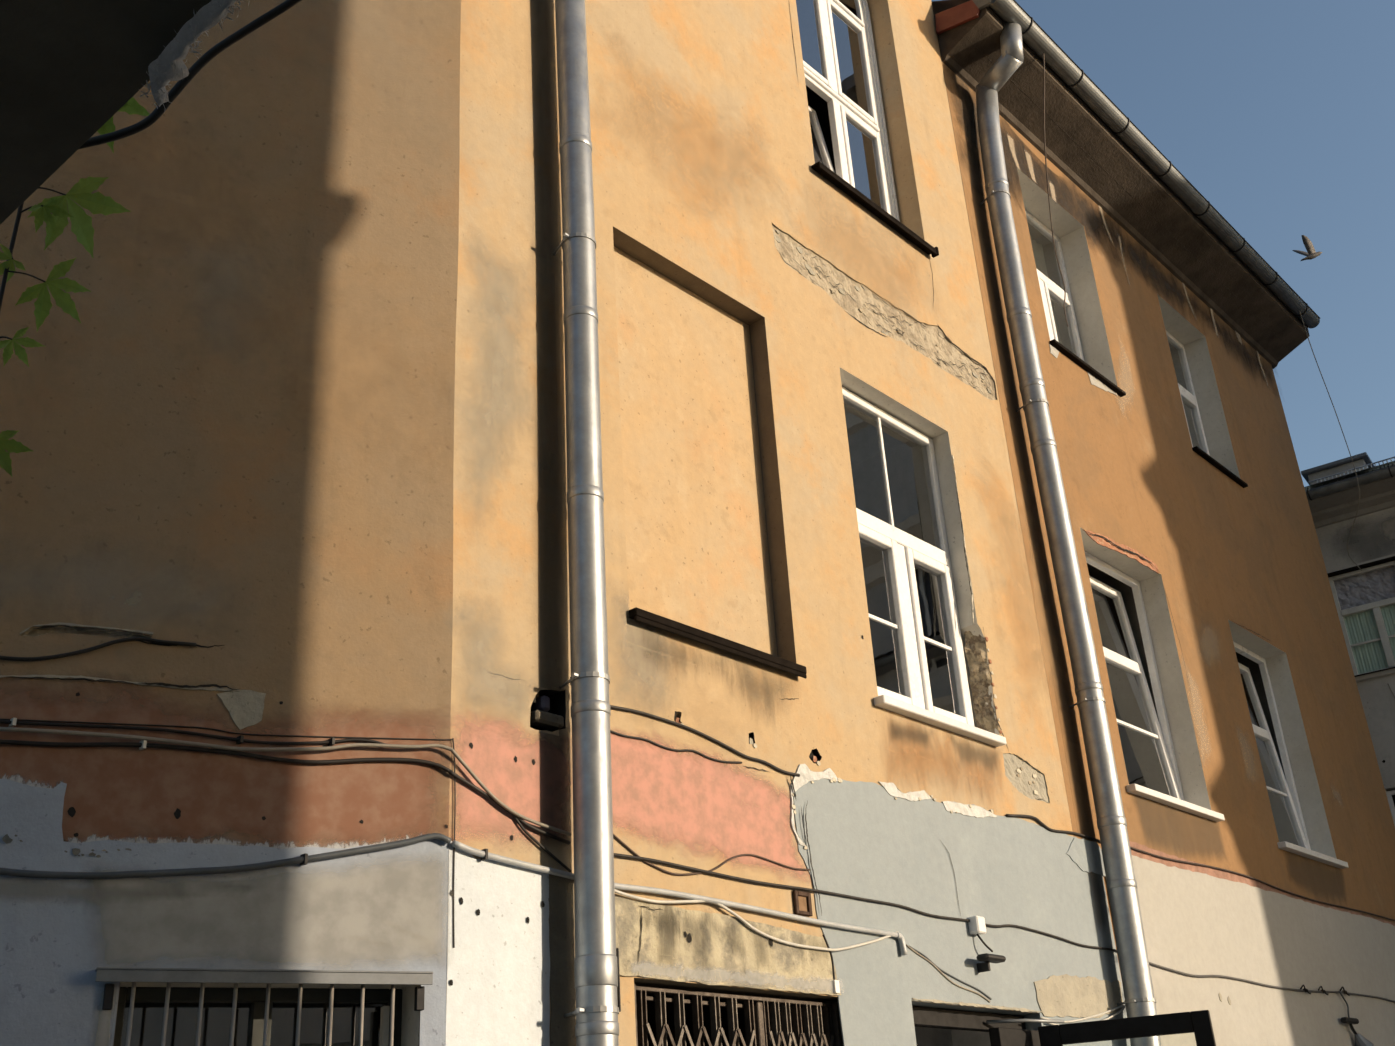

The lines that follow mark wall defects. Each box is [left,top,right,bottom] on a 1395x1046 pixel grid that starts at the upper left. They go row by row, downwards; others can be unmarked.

water stain [956,85,980,167]
water stain [1000,125,1271,385]
flaking render [772,223,997,400]
peeling [790,748,842,849]
peeling [878,781,997,818]
flaking render [1003,753,1050,803]